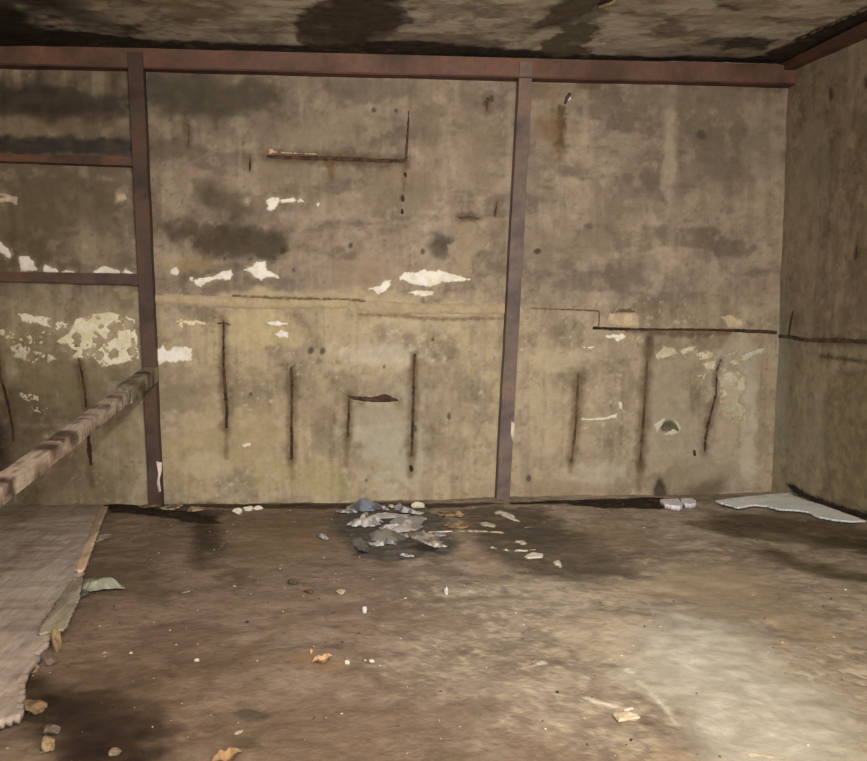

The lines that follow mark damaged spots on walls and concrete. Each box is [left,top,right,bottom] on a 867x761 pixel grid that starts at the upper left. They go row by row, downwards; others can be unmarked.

damp [292,0,404,50]
damp [721,38,776,50]
damp [0,135,131,155]
rust [267,111,409,178]
peeling [368,269,471,297]
peeling [0,312,139,367]
crack [530,307,867,344]
rust [217,320,231,428]
rust [346,394,399,440]
rust [638,338,650,468]
crack [693,359,721,456]
peeling [655,346,766,423]